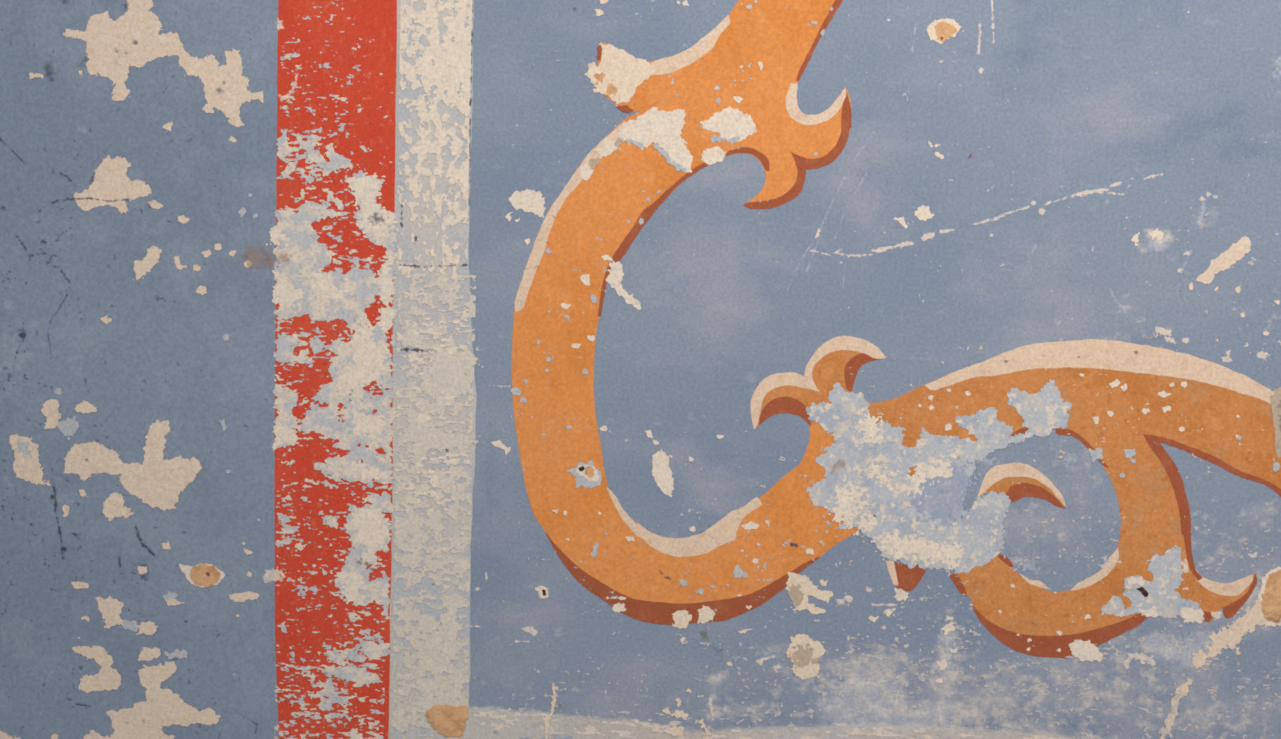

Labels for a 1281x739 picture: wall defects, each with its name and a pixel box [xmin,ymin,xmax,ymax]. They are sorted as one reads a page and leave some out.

peeling [63,0,264,144]
peeling [9,388,202,521]
peeling [68,581,221,739]